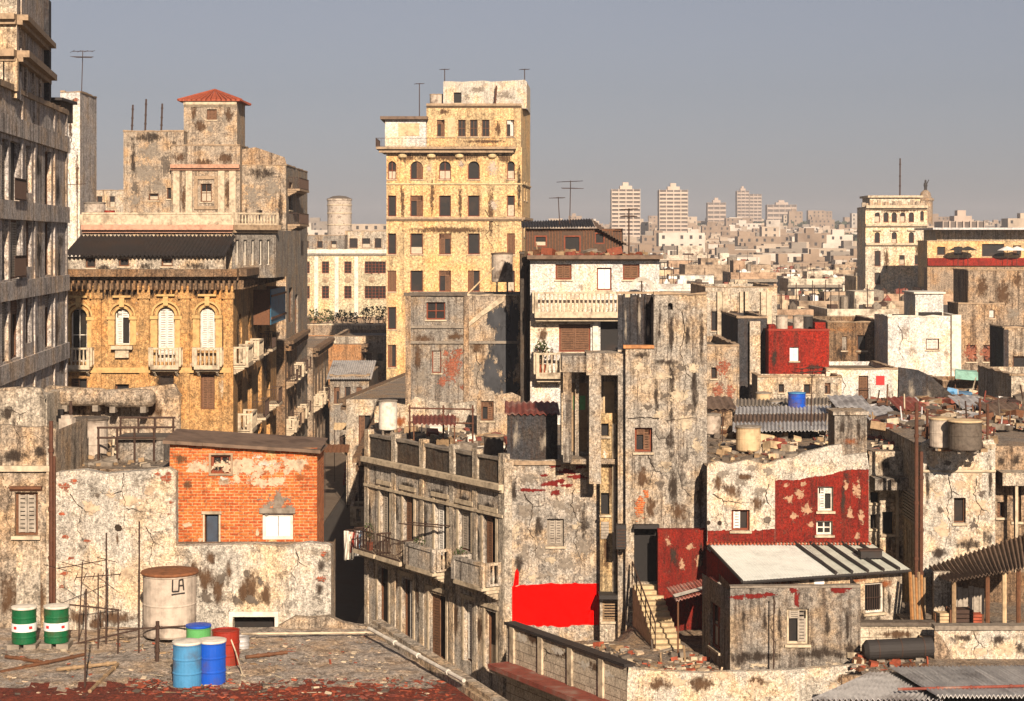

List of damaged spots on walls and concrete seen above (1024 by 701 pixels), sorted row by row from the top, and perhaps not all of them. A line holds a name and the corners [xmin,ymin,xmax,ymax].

leakage [130,132,232,171]
leakage [636,313,765,522]
crack [70,473,165,567]
flaking render [83,454,310,516]
leakage [191,552,270,605]
flaking render [513,486,595,582]
flaking render [679,543,703,570]
flaking render [783,482,814,528]
flaking render [843,479,865,539]
crack [945,477,989,547]
leakage [798,594,891,658]
leakage [731,651,778,666]